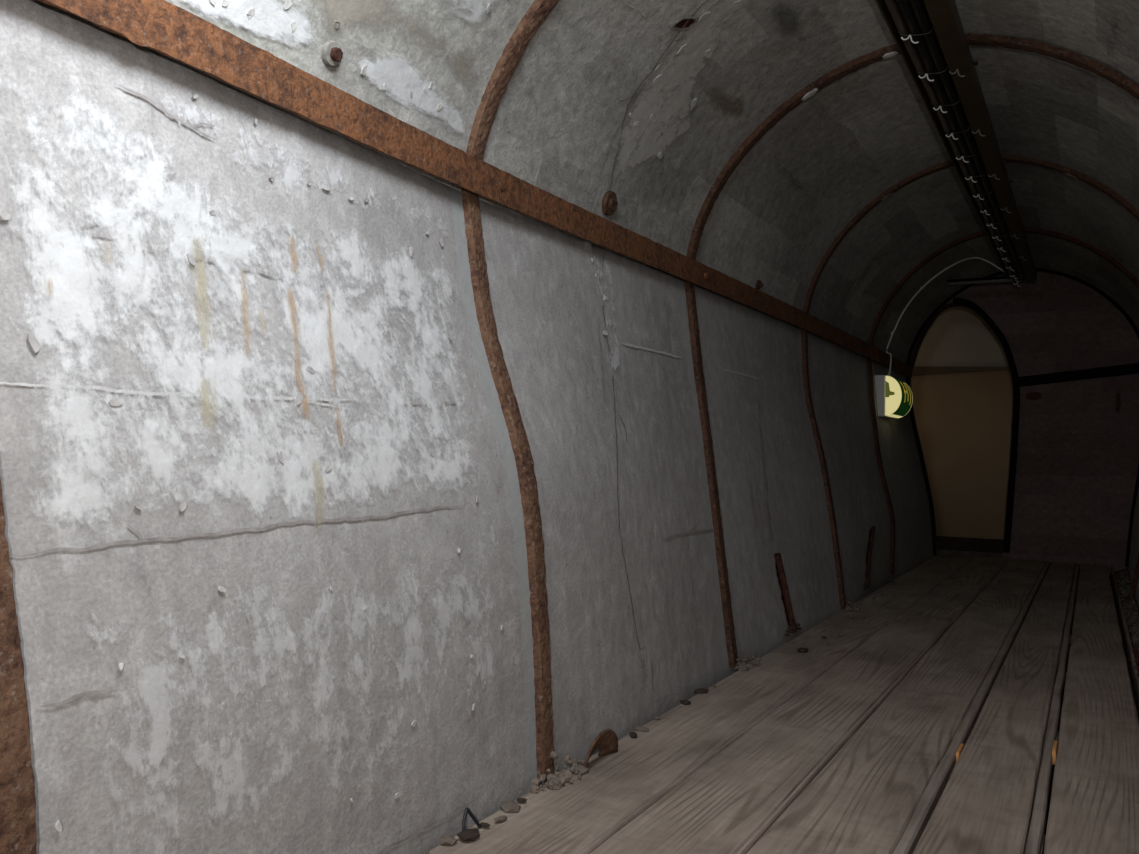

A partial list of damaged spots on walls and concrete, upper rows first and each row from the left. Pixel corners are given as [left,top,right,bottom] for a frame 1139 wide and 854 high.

crack [9,505,465,557]